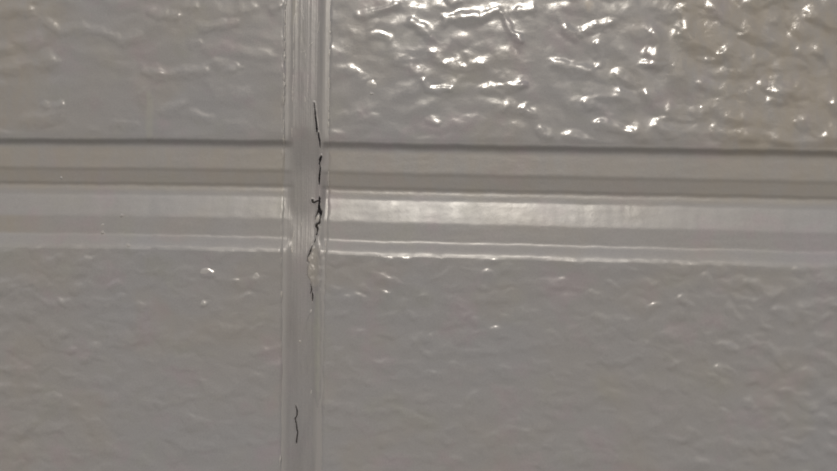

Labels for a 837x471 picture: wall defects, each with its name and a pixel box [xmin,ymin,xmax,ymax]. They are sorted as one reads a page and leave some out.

crack [311,104,323,235]